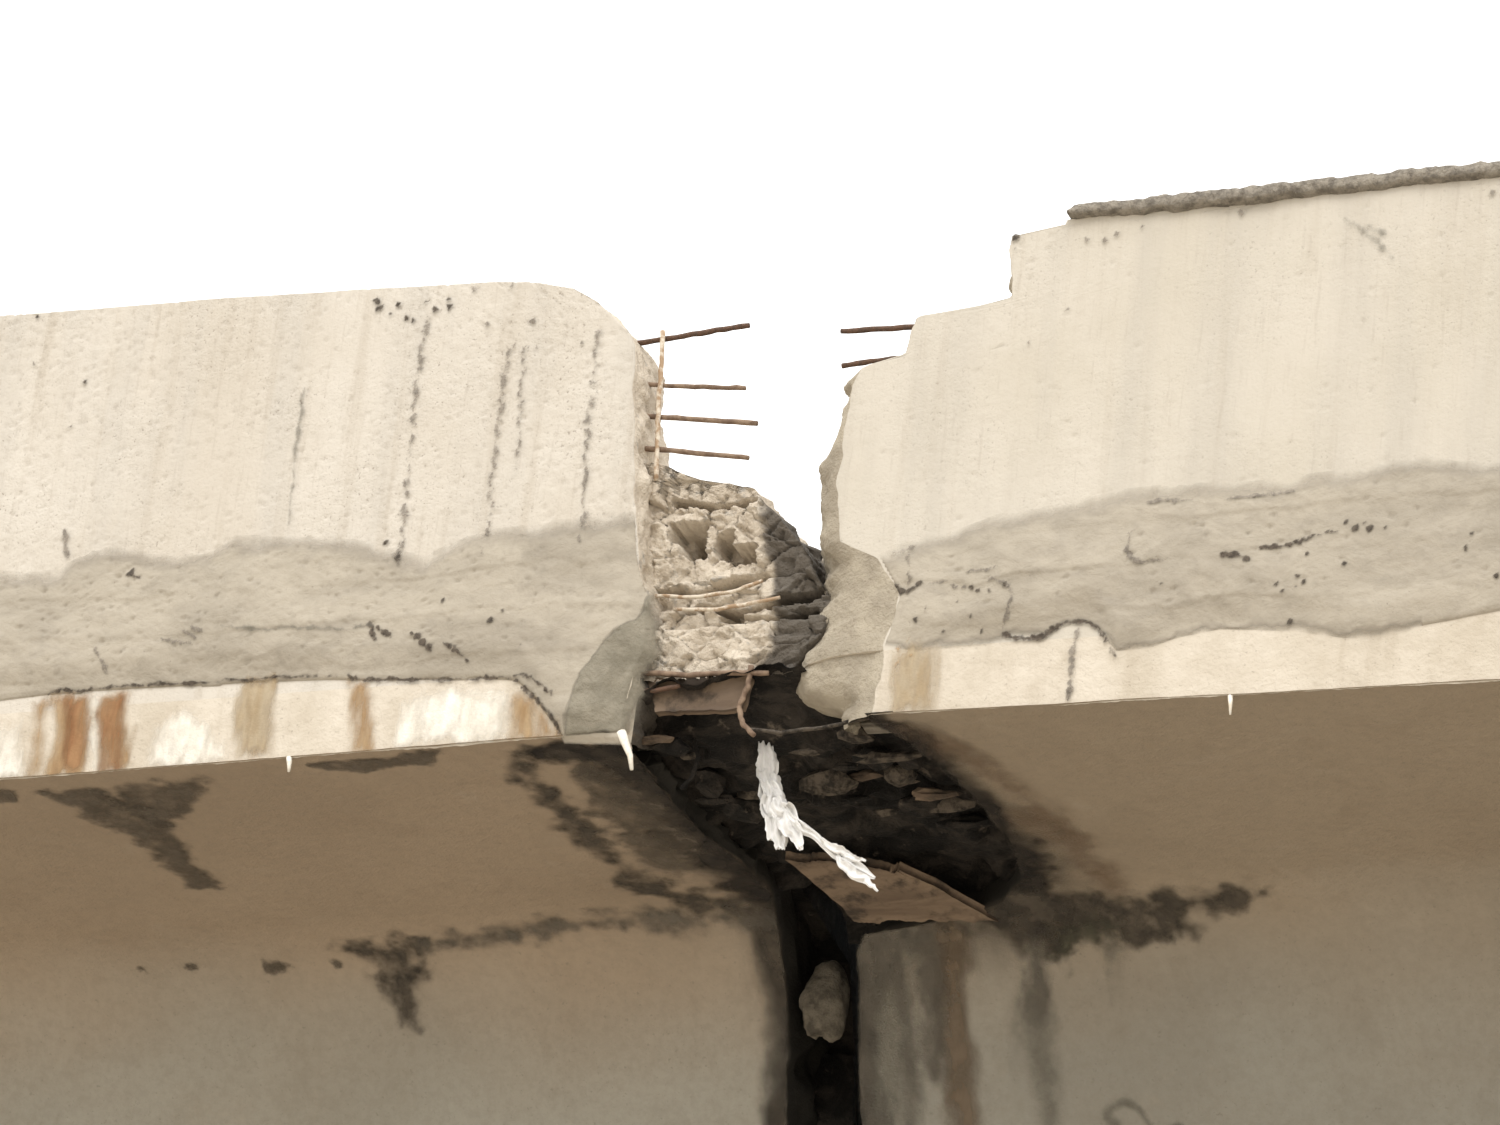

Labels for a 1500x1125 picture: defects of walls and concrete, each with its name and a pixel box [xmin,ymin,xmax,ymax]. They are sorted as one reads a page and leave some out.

spalling [637,323,976,824]
damp [0,730,22,803]
corrosion [35,694,129,775]
damp [87,699,101,771]
damp [152,713,223,765]
corrosion [235,678,277,752]
corrosion [351,684,373,750]
corrosion [512,696,558,737]
damp [39,783,218,890]
damp [333,731,786,1021]
damp [263,962,286,974]
damp [858,796,1265,1125]